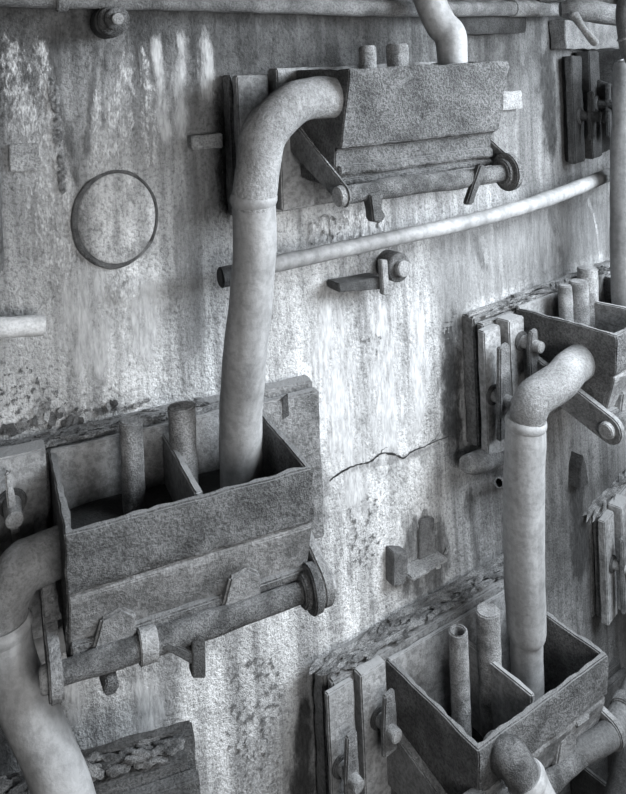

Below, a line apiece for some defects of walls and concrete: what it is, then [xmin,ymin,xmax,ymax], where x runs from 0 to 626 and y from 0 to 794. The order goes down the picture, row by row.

efflorescence [88,34,186,178]
leakage [201,20,230,218]
spalling [0,394,168,437]
crack [330,432,449,481]